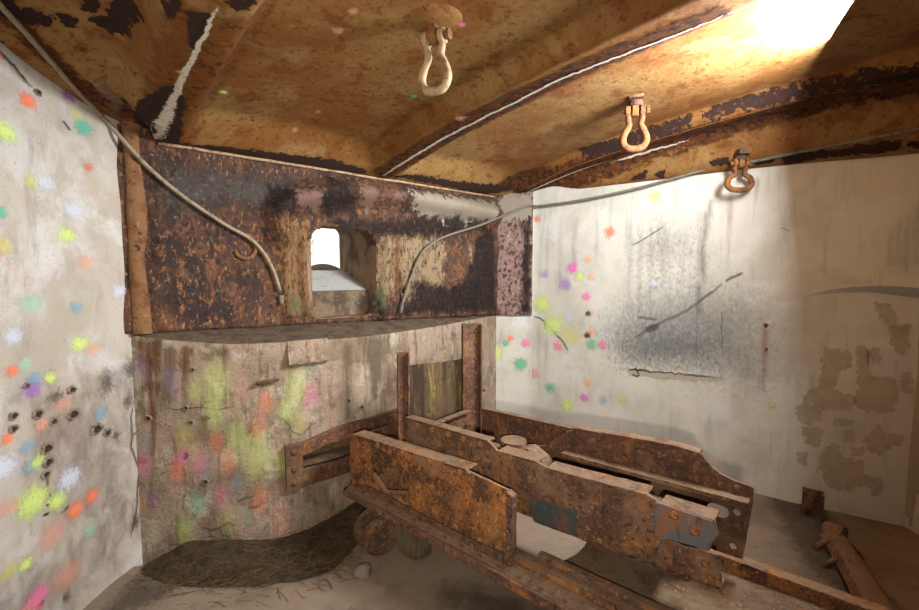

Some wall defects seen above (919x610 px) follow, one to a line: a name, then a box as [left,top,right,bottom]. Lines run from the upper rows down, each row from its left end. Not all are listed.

peeling [795,302,919,525]